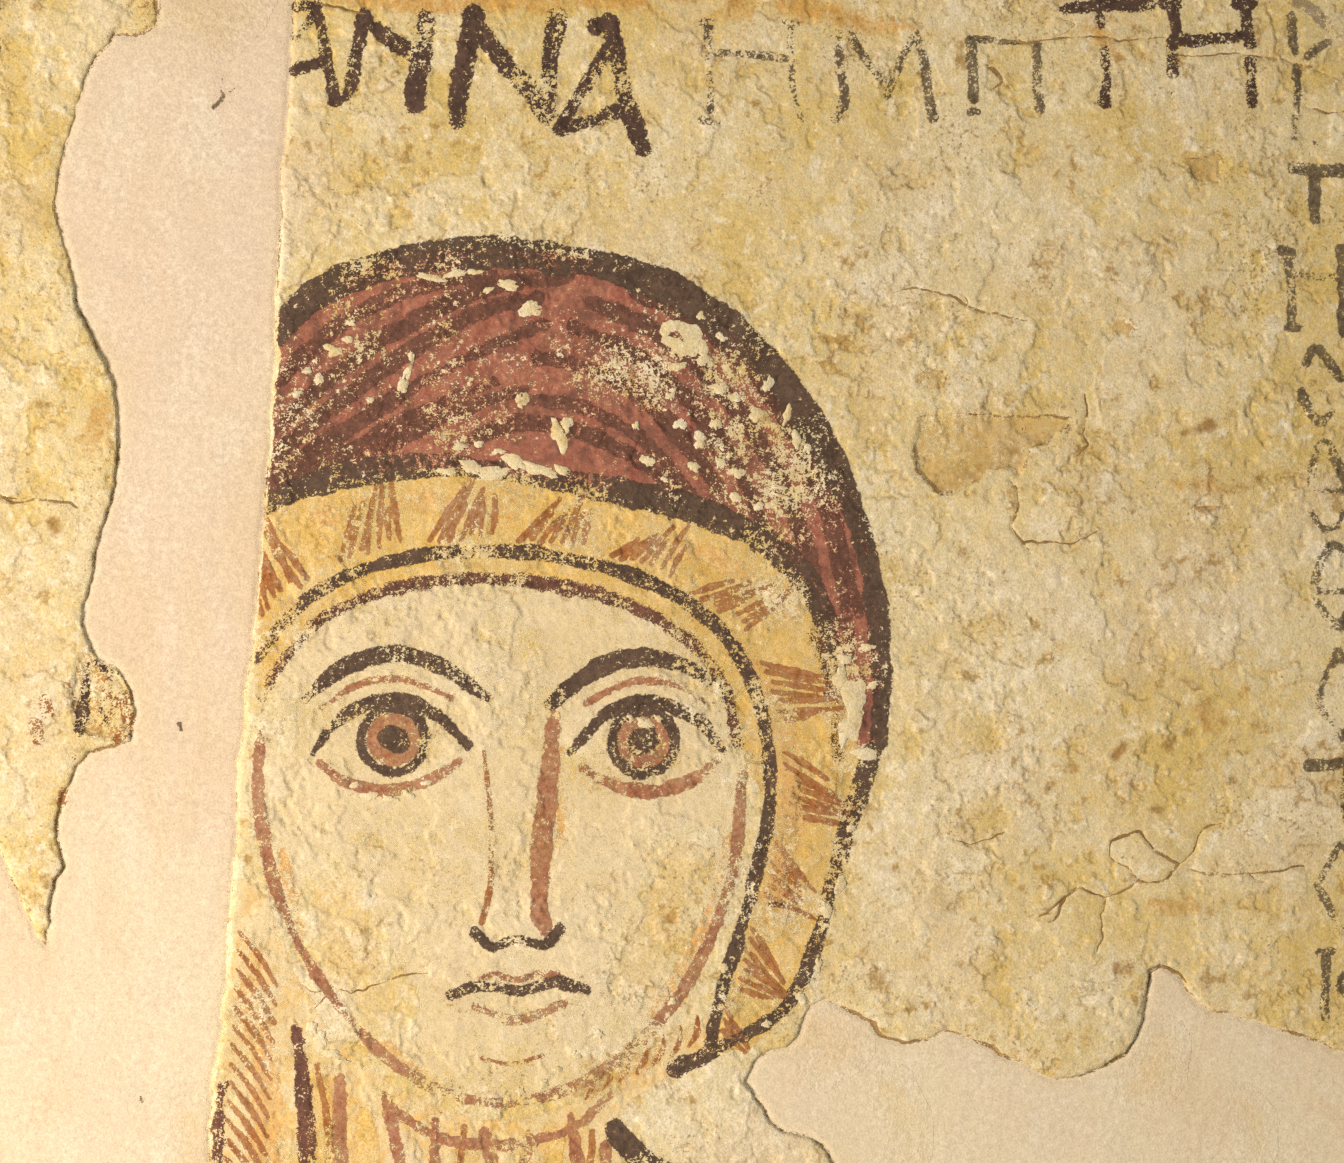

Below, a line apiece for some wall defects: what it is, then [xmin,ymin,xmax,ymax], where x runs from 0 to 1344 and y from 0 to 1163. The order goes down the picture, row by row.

peeling [416,269,542,317]
peeling [292,319,356,398]
peeling [397,351,415,393]
peeling [660,311,728,371]
peeling [435,417,574,481]
peeling [672,418,792,511]
peeling [708,382,811,454]
crack [1075,394,1089,457]
crack [1009,479,1097,550]
spalling [0,0,294,1163]
crack [1038,823,1303,952]
spalling [745,965,1344,1163]